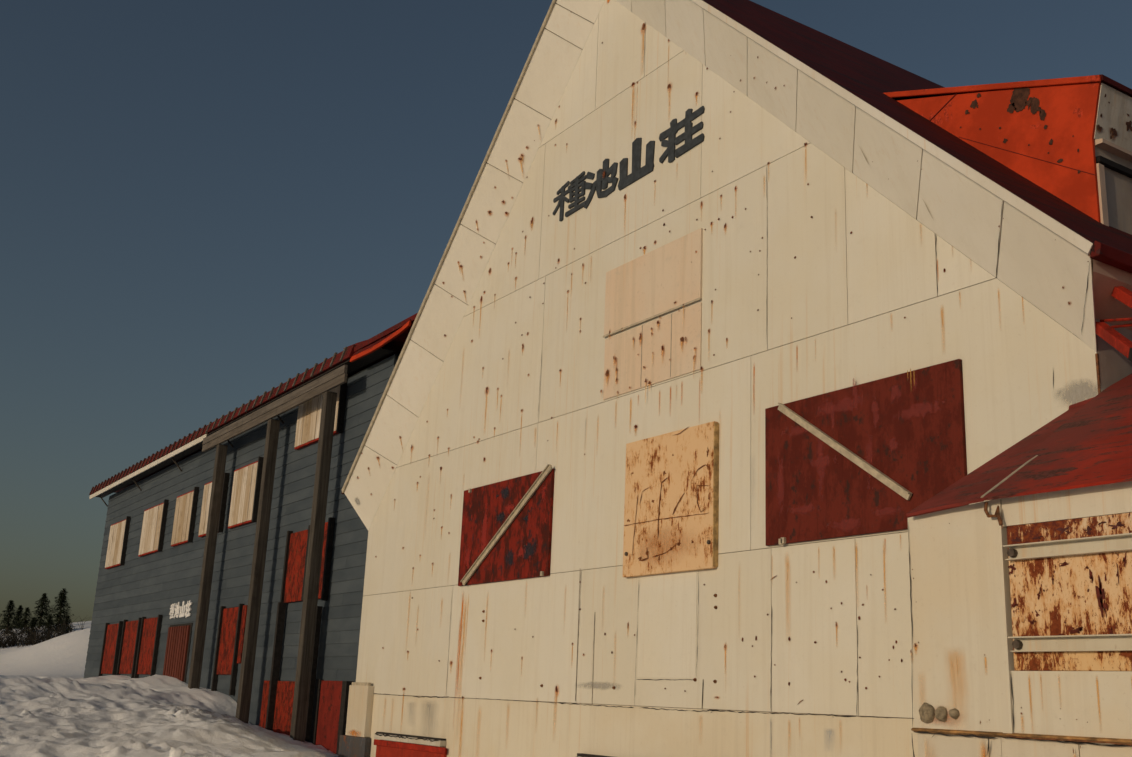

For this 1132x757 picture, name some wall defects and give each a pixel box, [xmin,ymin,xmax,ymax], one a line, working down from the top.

peeling [1007,87,1063,163]
corrosion [600,356,671,431]